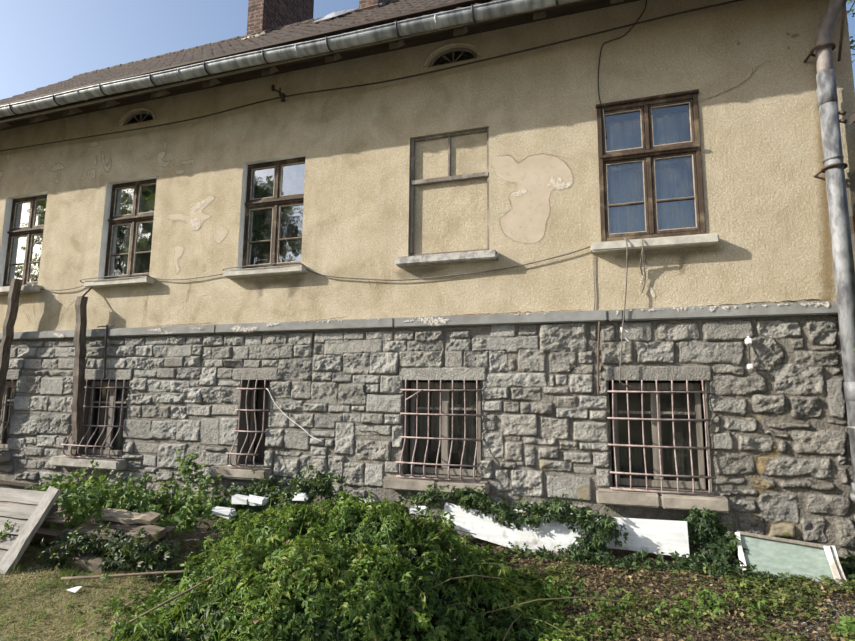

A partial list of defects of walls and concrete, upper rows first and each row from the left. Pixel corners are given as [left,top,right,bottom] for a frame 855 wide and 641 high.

flaking render [168,195,214,231]
flaking render [492,153,573,244]